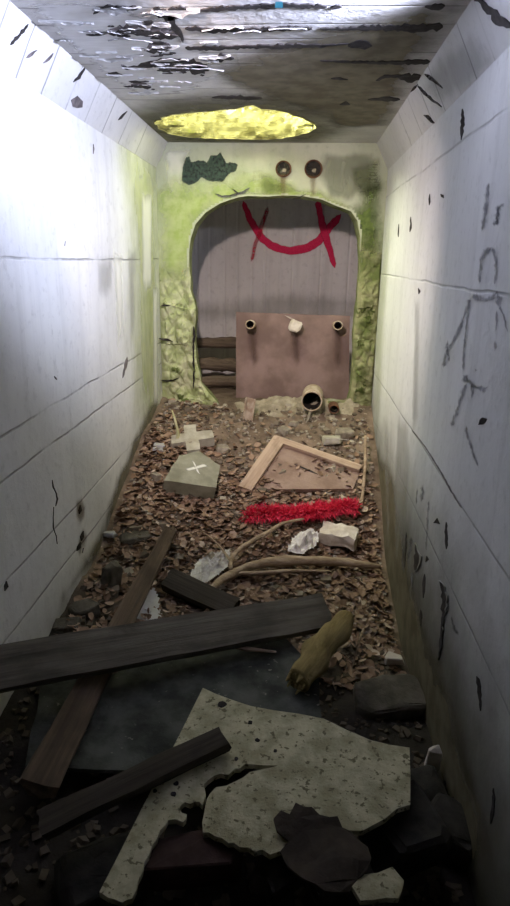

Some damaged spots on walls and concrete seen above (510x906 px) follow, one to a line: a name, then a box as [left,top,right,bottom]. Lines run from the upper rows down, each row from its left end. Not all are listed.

peeling [35,4,234,95]
spalling [348,40,372,50]
spalling [376,73,421,83]
spalling [154,105,316,140]
water stain [325,157,368,196]
crack [51,480,59,544]